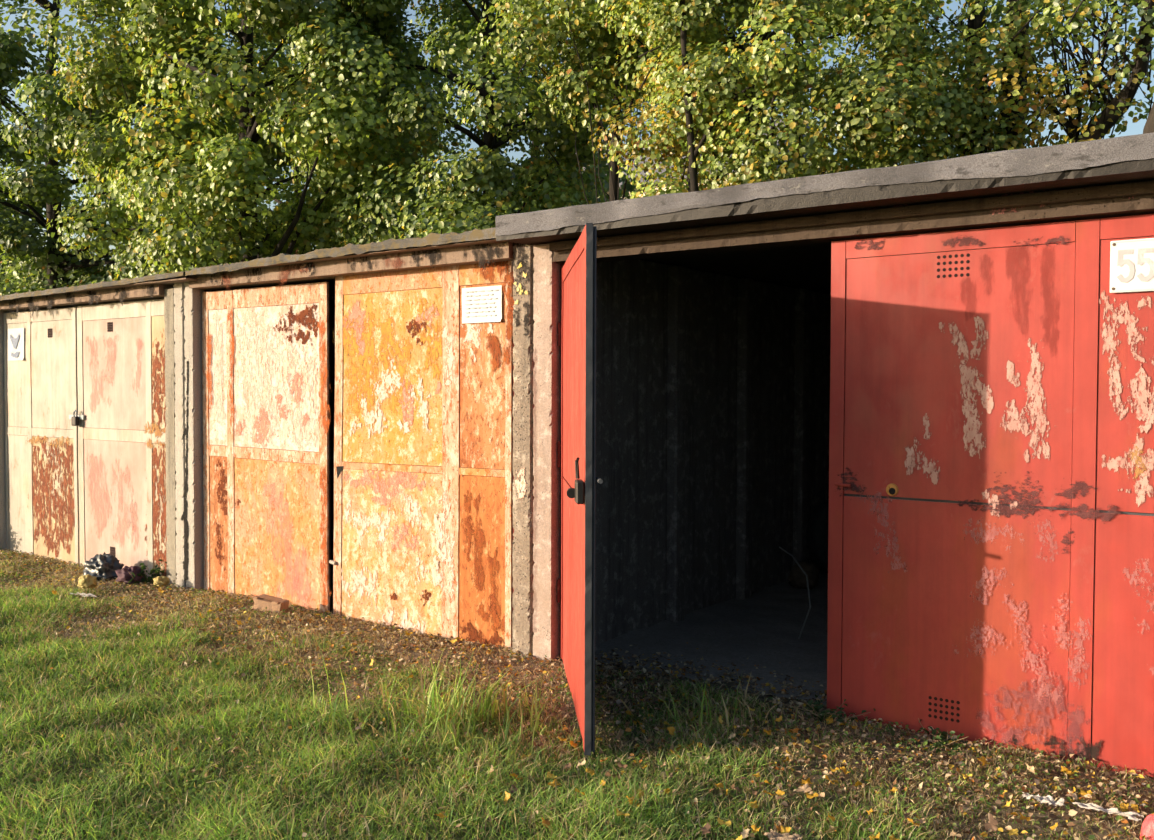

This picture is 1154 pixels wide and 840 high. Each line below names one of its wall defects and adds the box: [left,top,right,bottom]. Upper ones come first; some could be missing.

rust [27,435,75,557]
rust [144,333,167,577]
peeling [210,307,319,451]
rust [320,468,330,607]
rust [273,298,443,434]
peeling [341,566,429,633]
peeling [343,461,455,599]
peeling [348,305,493,442]
rust [458,491,505,647]
peeling [938,316,1051,463]
rust [959,471,1121,524]
peeling [1098,291,1154,507]